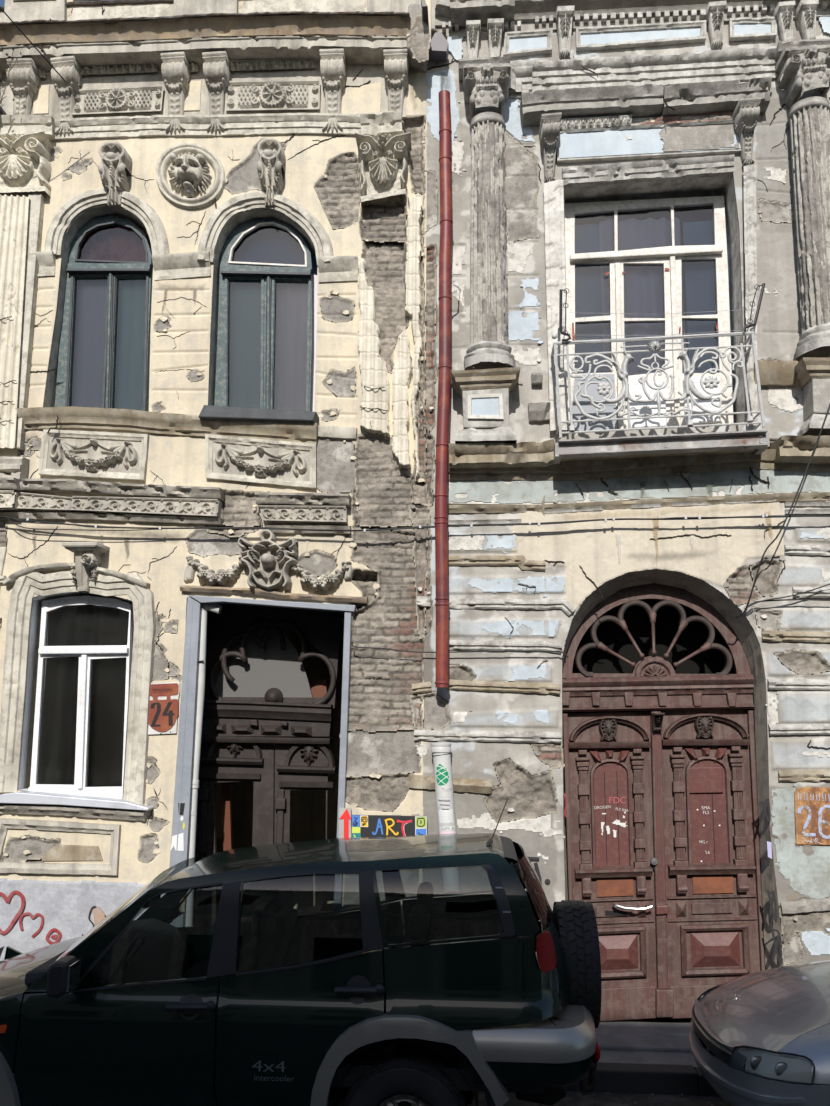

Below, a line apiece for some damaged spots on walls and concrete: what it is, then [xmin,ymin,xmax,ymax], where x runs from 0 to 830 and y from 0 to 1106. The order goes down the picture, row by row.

crack [281,134,345,160]
crack [177,198,217,244]
peeling [504,98,544,365]
spalling [314,29,476,812]
spalling [0,522,8,547]
crack [8,528,57,566]
crack [118,546,177,646]
crack [544,560,611,601]
spalling [723,557,786,631]
spalling [775,649,830,675]
spalling [457,744,565,838]
peeling [771,784,830,965]